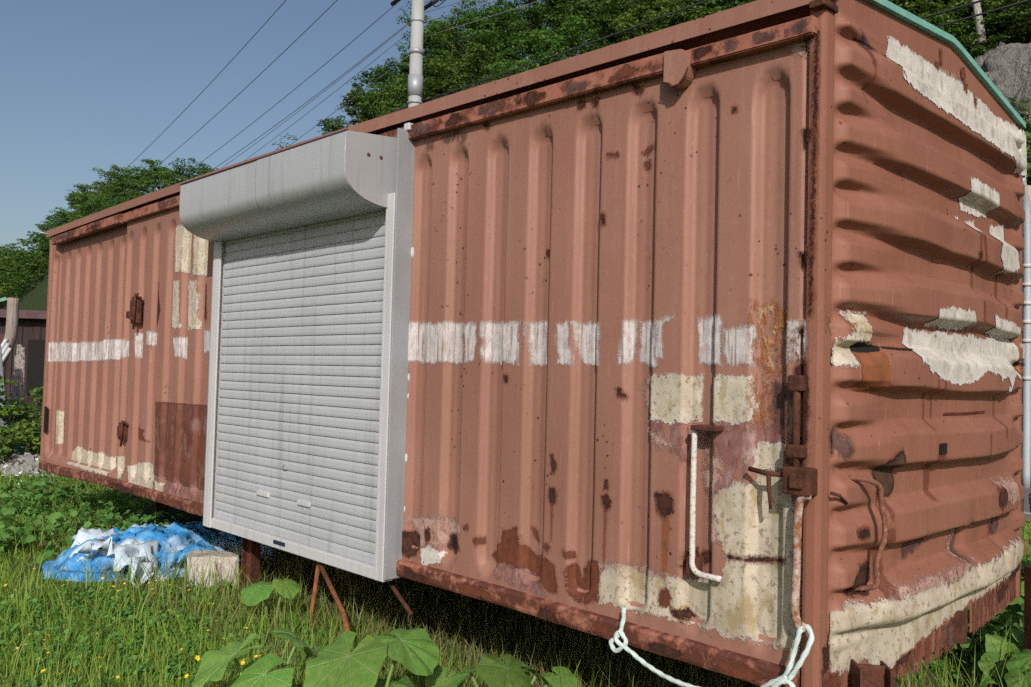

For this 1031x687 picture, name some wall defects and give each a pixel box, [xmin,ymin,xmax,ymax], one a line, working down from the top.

peeling [885,36,1027,177]
corrosion [748,19,820,445]
peeling [955,178,1020,274]
peeling [826,310,873,368]
peeling [902,305,1025,394]
corrosion [138,401,207,509]
peeling [463,314,806,653]
corrosion [399,513,461,585]
corrosion [449,581,493,601]
corrosion [844,560,871,598]
corrosion [857,526,871,540]
peeling [828,536,1024,676]